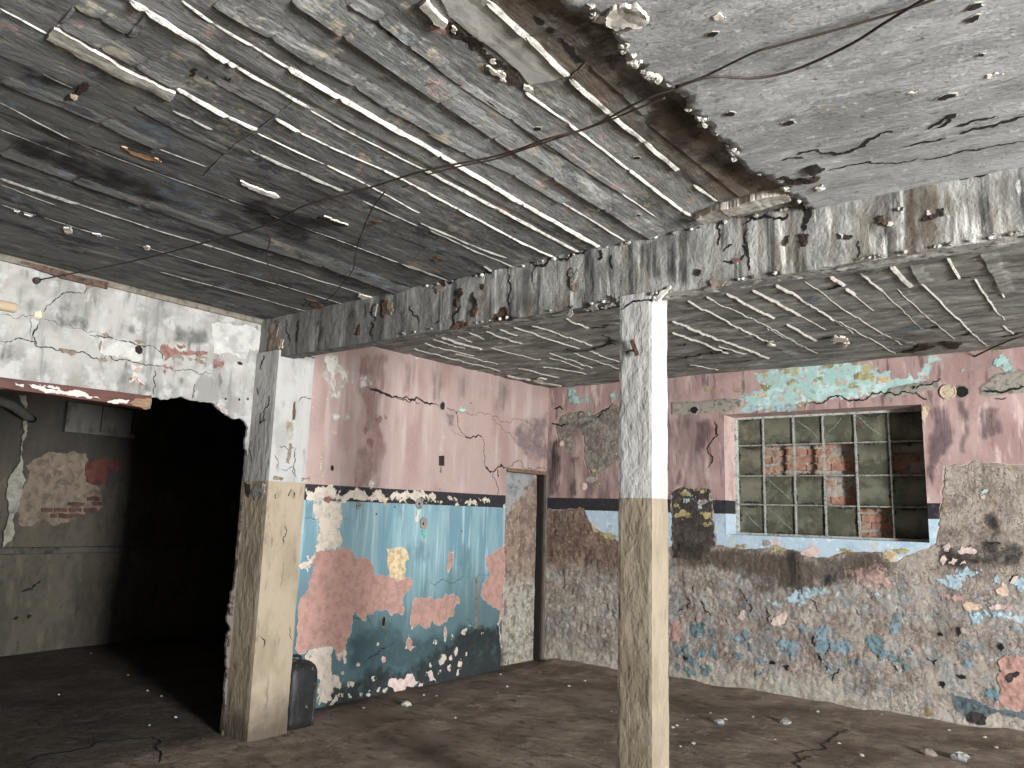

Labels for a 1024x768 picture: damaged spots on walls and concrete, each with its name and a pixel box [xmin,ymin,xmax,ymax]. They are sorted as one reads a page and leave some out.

spalling [447,21,533,92]
flaking render [584,3,745,166]
crack [782,113,1024,180]
crack [1,288,211,398]
flaking render [160,321,284,374]
peeling [16,384,151,409]
crack [364,386,613,495]
crack [707,421,718,466]
flaking render [18,451,104,526]
peeling [295,477,490,705]
peeling [936,544,1024,725]
crack [792,729,848,768]